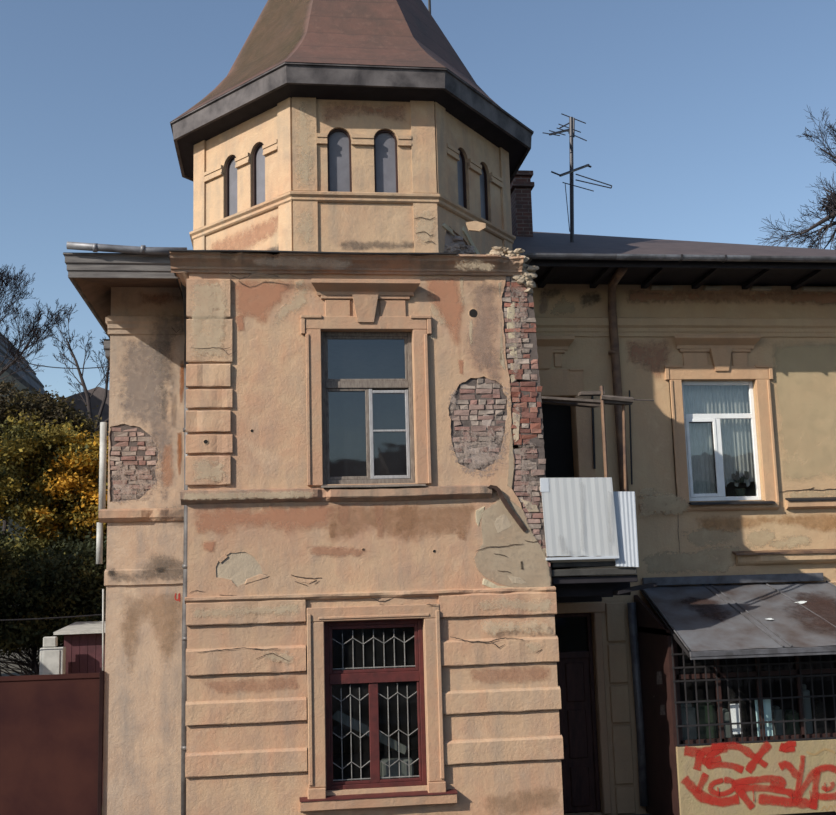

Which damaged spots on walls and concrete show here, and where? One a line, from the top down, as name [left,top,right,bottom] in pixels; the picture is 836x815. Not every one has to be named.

flaking render [414,210,552,588]
flaking render [109,424,172,502]
flaking render [216,552,270,587]
crack [204,647,289,661]
crack [452,637,542,653]